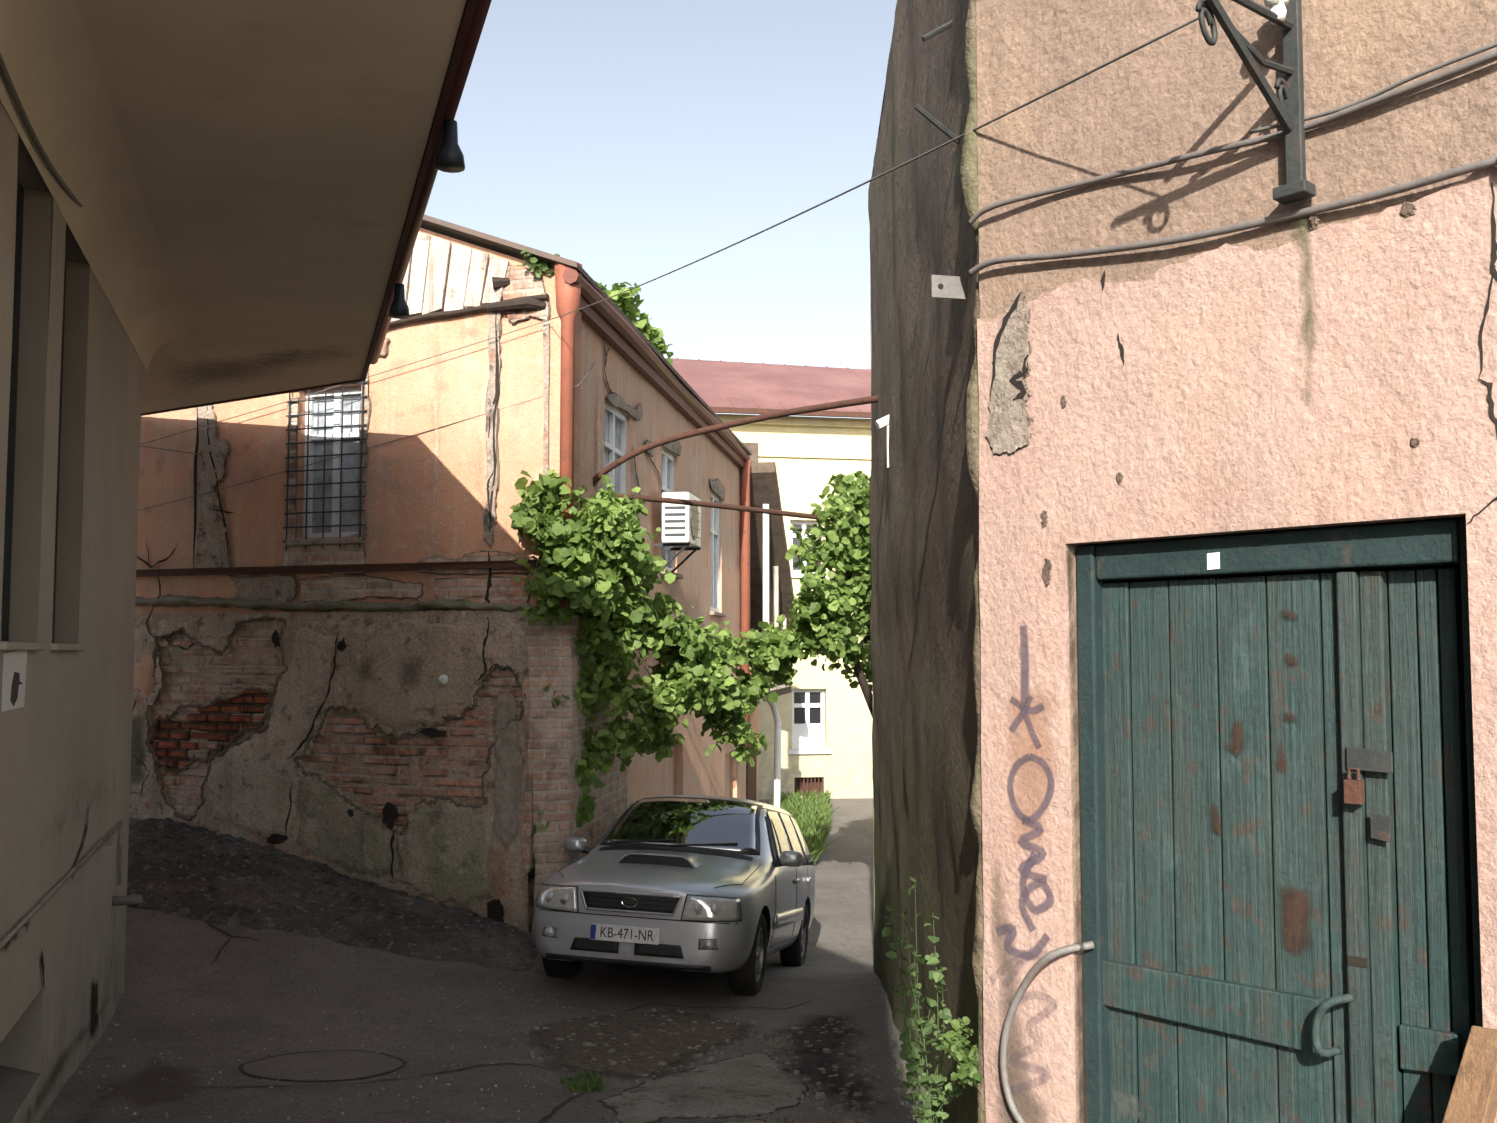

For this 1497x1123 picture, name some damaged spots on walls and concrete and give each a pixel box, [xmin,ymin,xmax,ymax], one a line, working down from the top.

peeling [1400,201,1417,219]
spalling [985,290,1035,456]
crack [1478,183,1497,430]
spalling [130,265,551,836]
crack [477,310,513,681]
crack [1467,497,1497,524]
crack [285,631,347,842]
crack [310,1063,548,1086]
crack [538,1093,585,1123]